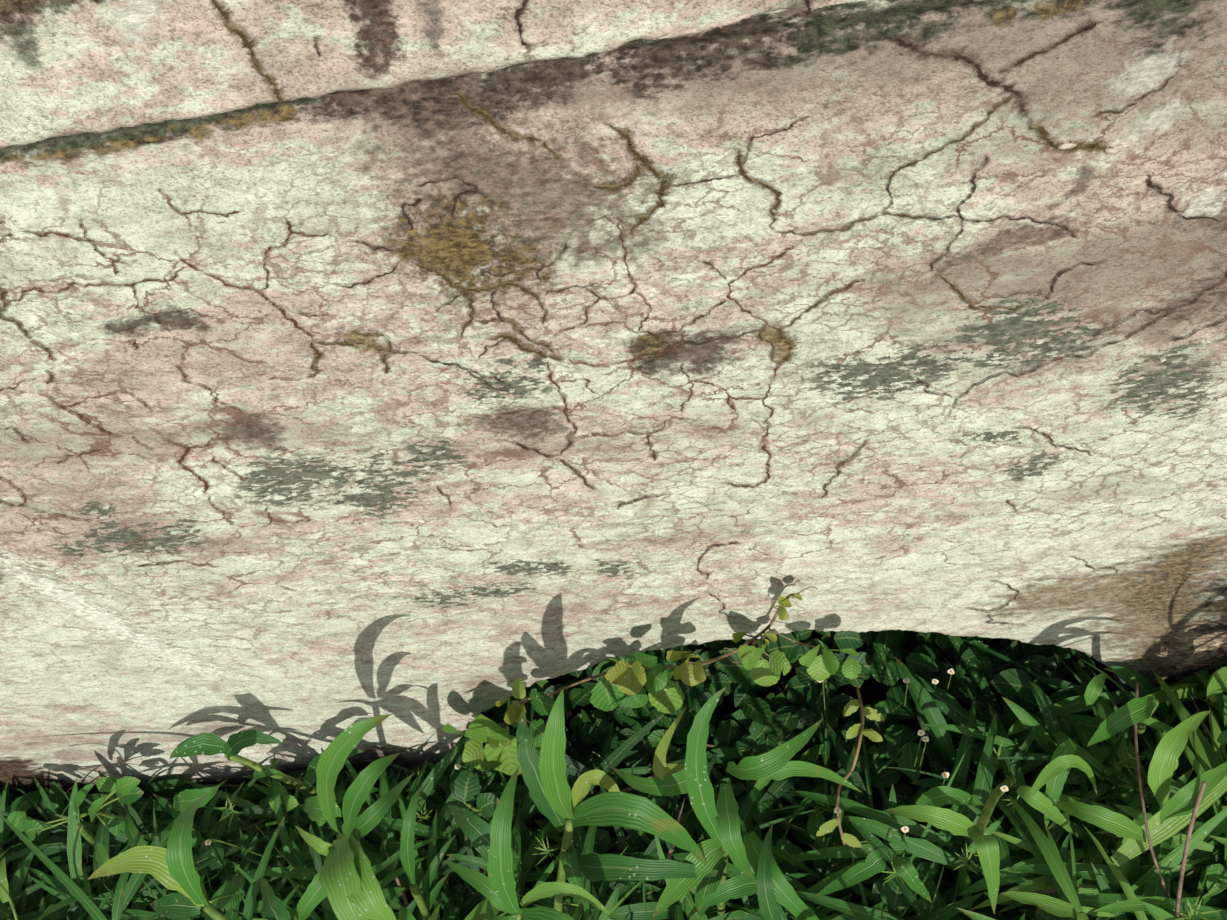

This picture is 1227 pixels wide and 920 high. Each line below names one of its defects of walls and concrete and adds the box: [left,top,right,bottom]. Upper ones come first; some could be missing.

crack [211,0,283,103]
crack [514,0,532,46]
leakage [302,0,821,267]
crack [1147,174,1225,221]
crack [0,21,1177,521]
leakage [628,332,740,375]
crack [917,274,1227,417]
crack [137,560,216,568]
crack [697,543,741,617]
crack [963,581,1025,625]